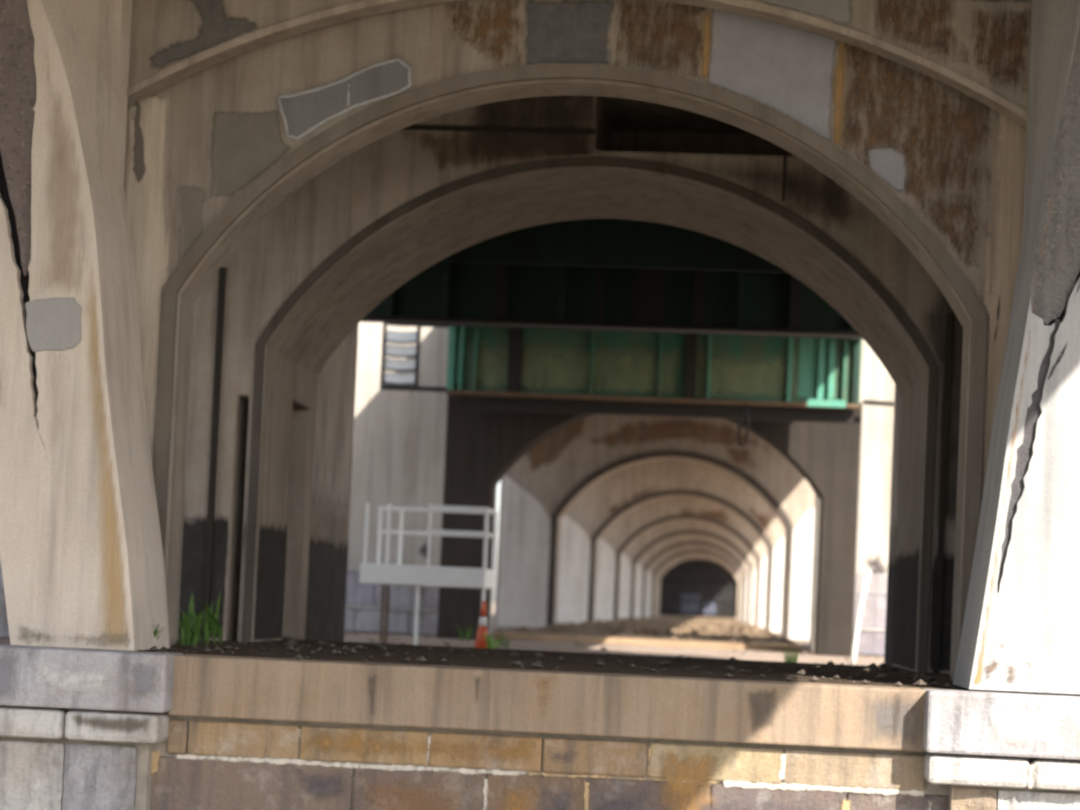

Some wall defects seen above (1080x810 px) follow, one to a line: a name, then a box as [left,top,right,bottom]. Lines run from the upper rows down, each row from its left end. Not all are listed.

peeling [150,0,256,67]
corrosion [450,0,520,62]
corrosion [616,2,710,77]
crack [0,151,30,317]
spalling [0,0,37,276]
corrosion [834,41,990,265]
spalling [1030,27,1080,325]
crack [30,347,44,445]
crack [997,272,1080,593]
corrosion [664,754,711,810]